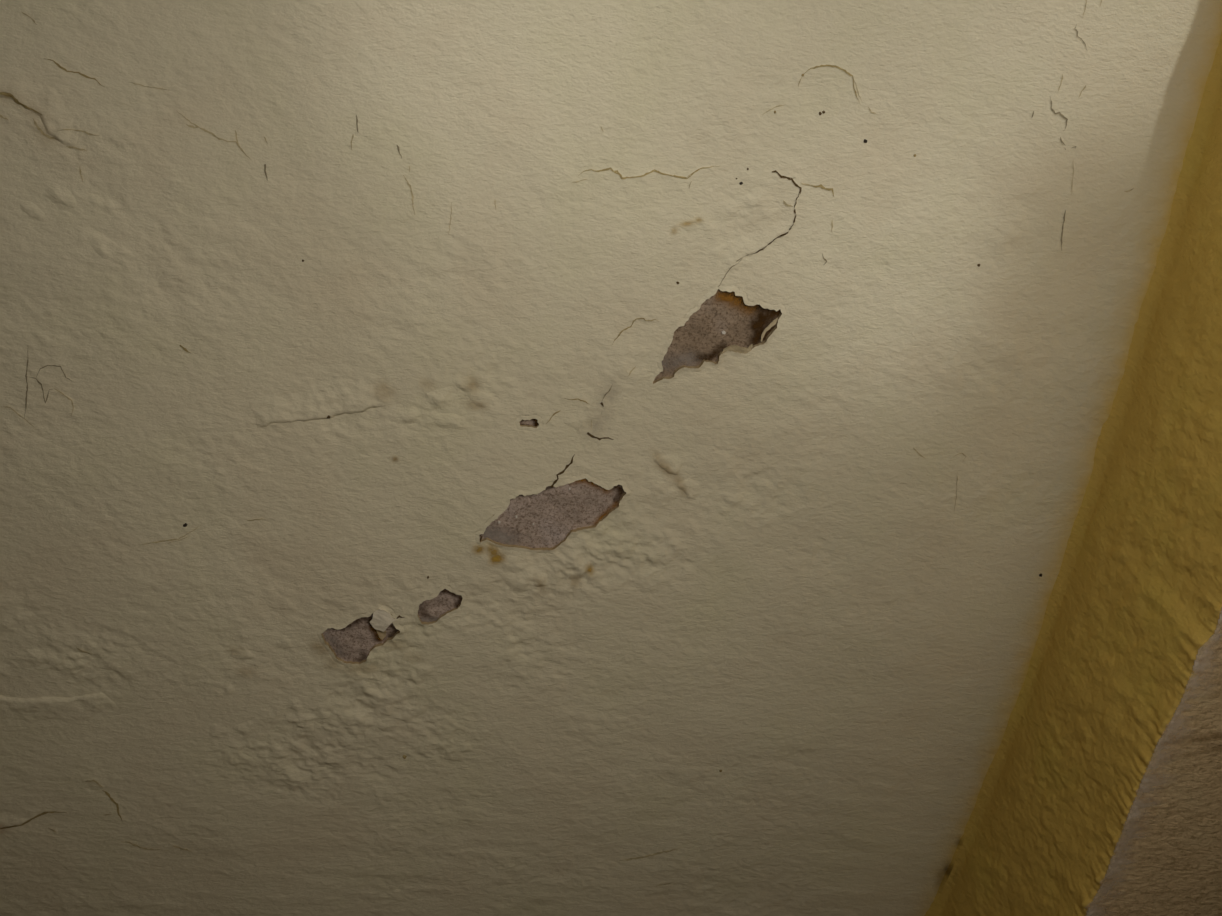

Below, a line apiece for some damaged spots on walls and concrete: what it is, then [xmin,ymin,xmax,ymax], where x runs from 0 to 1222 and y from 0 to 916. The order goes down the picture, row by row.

crack [765,64,876,114]
crack [572,166,719,187]
crack [718,170,834,287]
peeling [648,284,787,388]
peeling [475,474,631,554]
peeling [316,585,467,668]